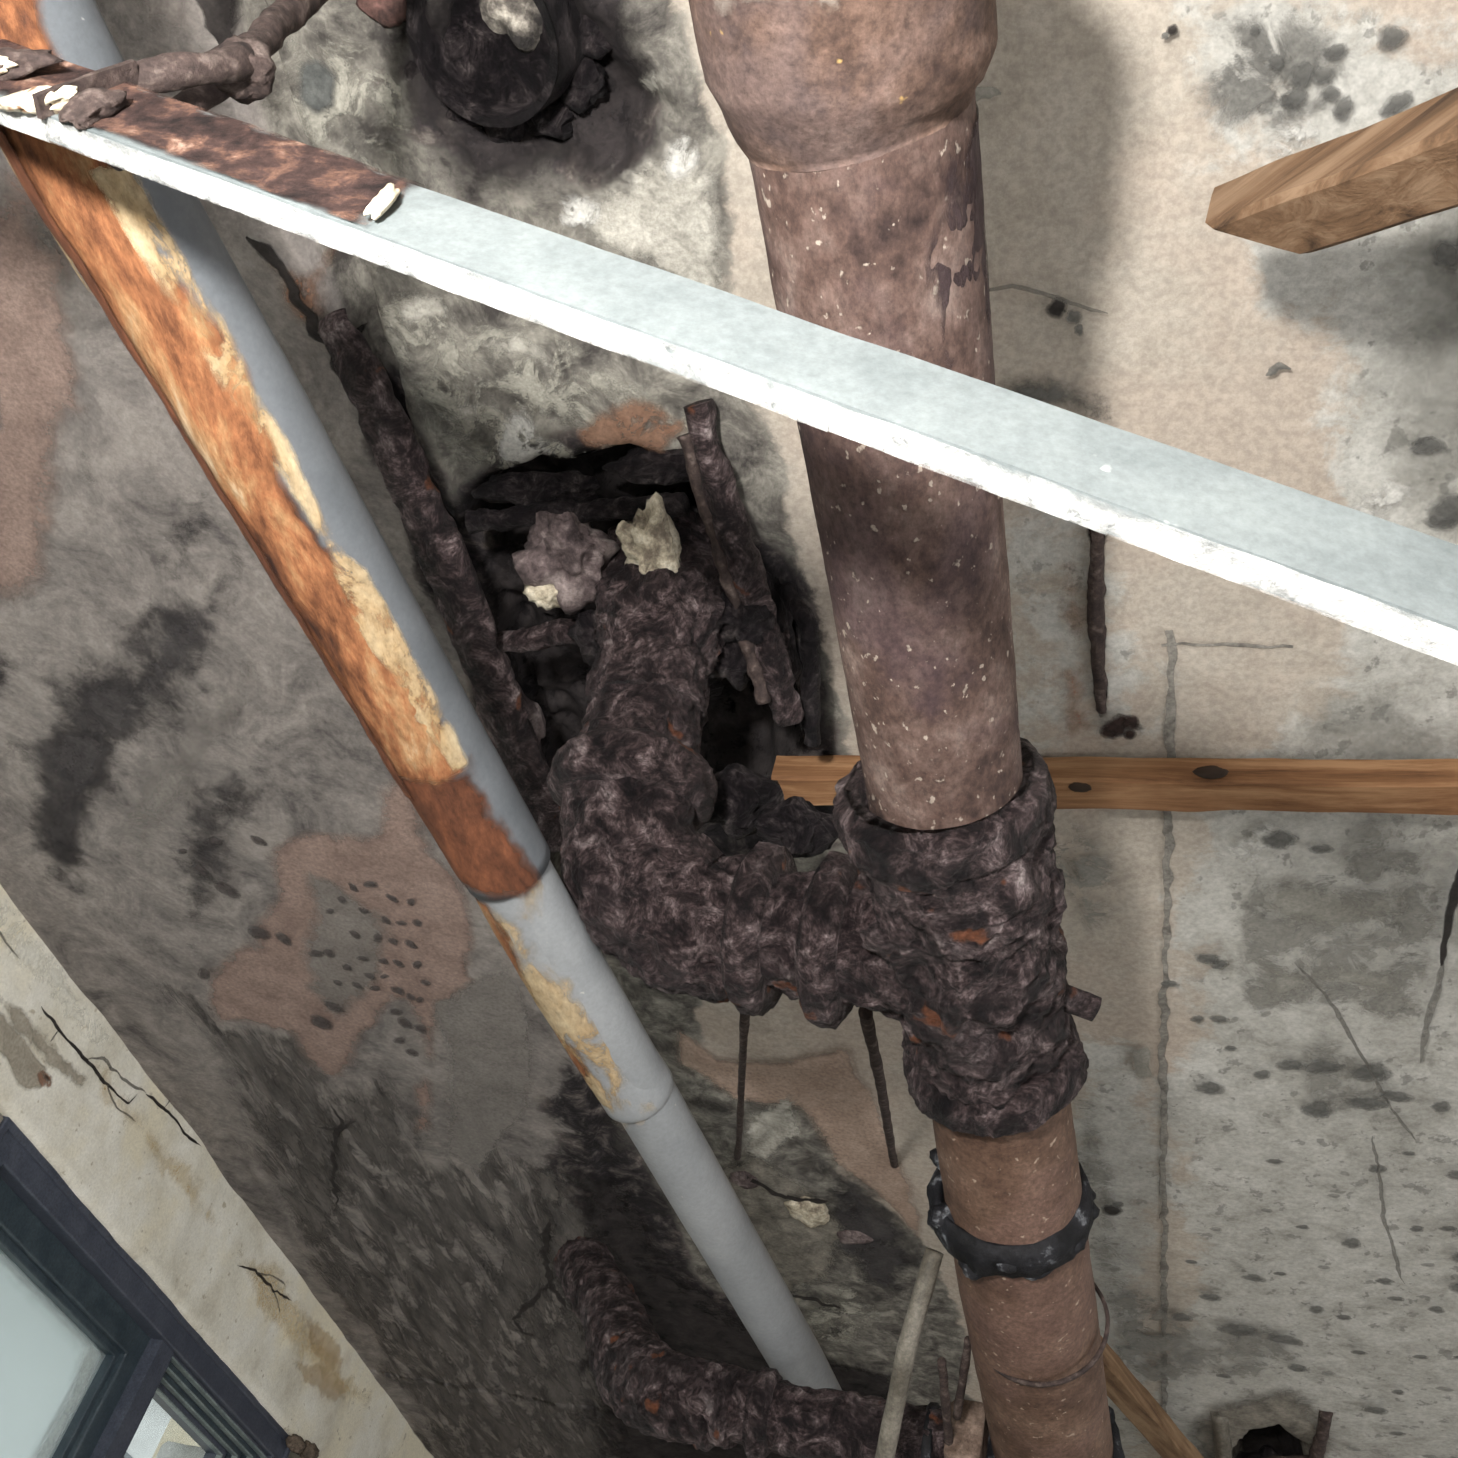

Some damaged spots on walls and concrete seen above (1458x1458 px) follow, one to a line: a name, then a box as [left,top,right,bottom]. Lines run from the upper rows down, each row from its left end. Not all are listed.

peeling [1161,24,1177,39]
water stain [1208,22,1352,151]
water stain [1378,25,1408,50]
water stain [1379,91,1412,116]
water stain [563,138,722,289]
spalling [0,47,1458,858]
water stain [1424,495,1458,529]
water stain [31,590,219,881]
peeling [177,849,240,897]
peeling [198,783,531,1171]
crack [1420,870,1458,1063]
crack [41,1006,200,1145]